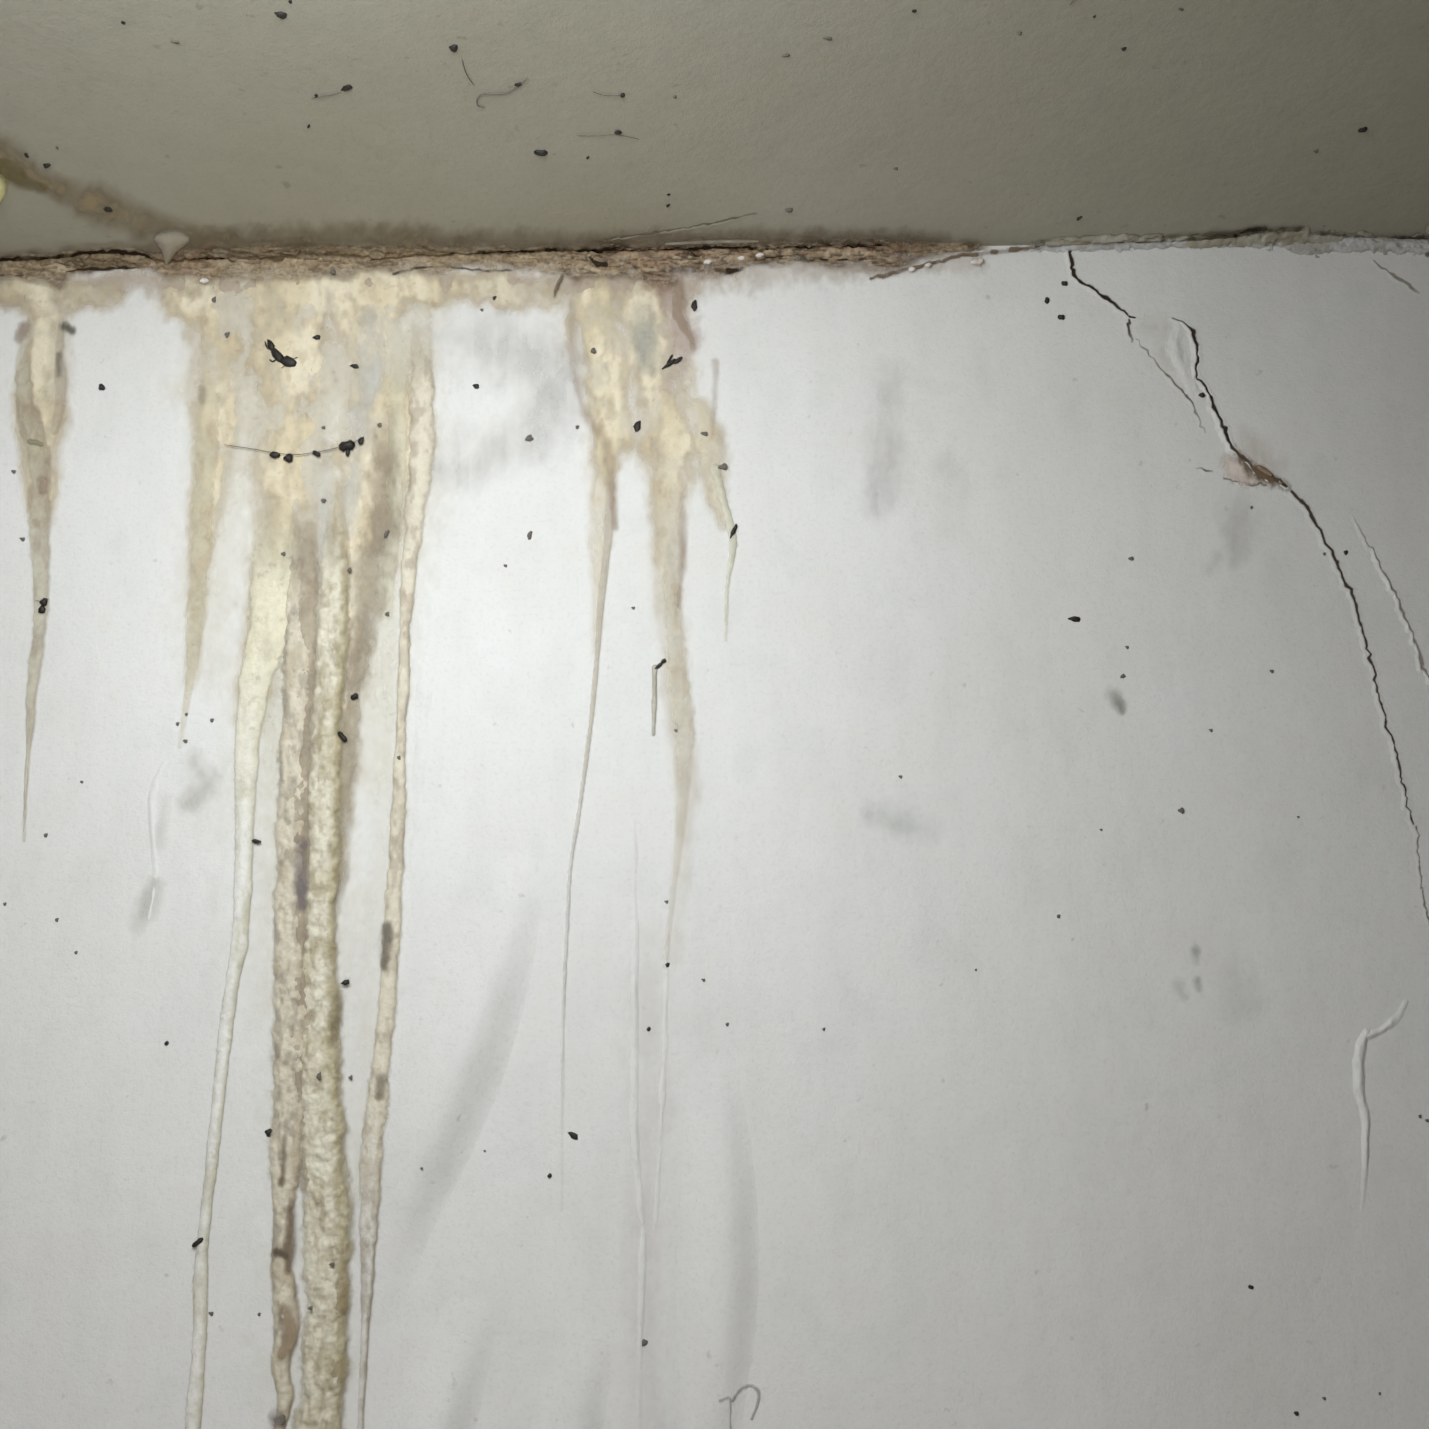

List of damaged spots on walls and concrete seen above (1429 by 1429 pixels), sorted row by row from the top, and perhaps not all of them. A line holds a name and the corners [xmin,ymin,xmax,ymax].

leakage [0,277,121,815]
leakage [162,266,737,1429]
crack [1035,224,1429,932]